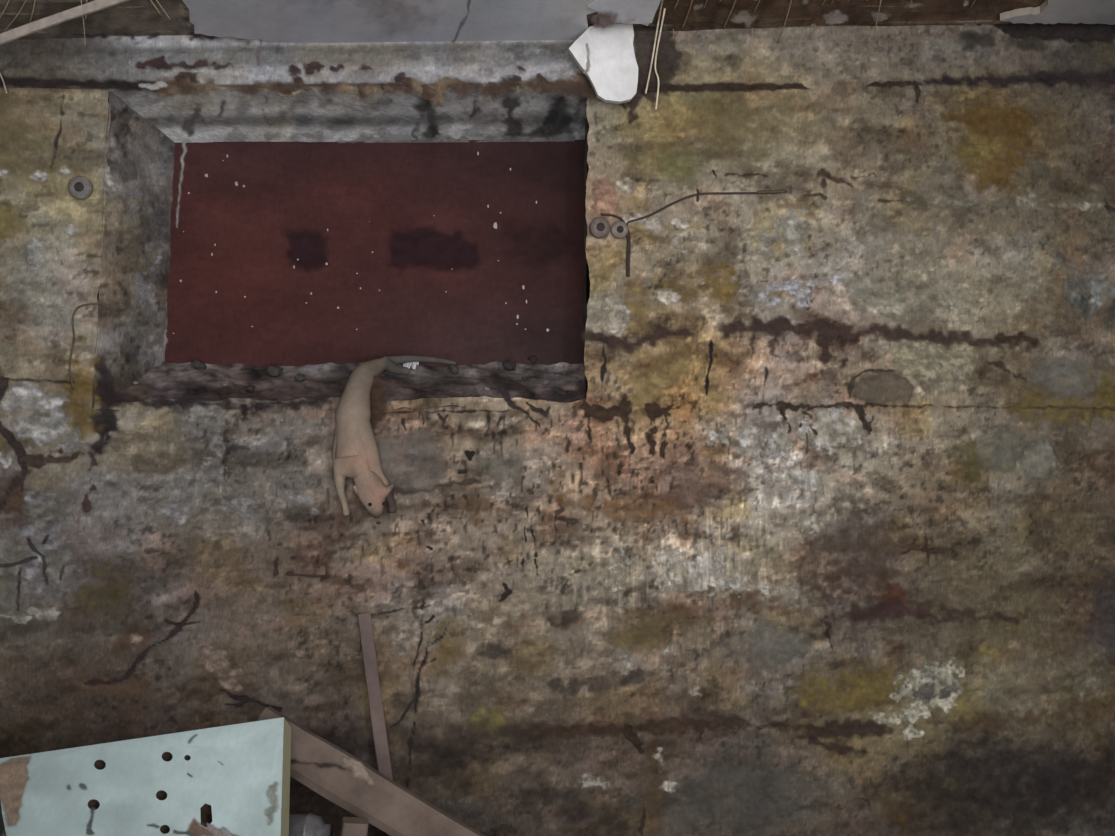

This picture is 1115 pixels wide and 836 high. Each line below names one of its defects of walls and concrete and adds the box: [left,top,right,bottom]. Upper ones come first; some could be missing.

flaking render [649,0,1115,72]
damp [962,32,994,48]
crack [0,378,98,512]
crack [0,535,65,611]
crack [84,591,200,685]